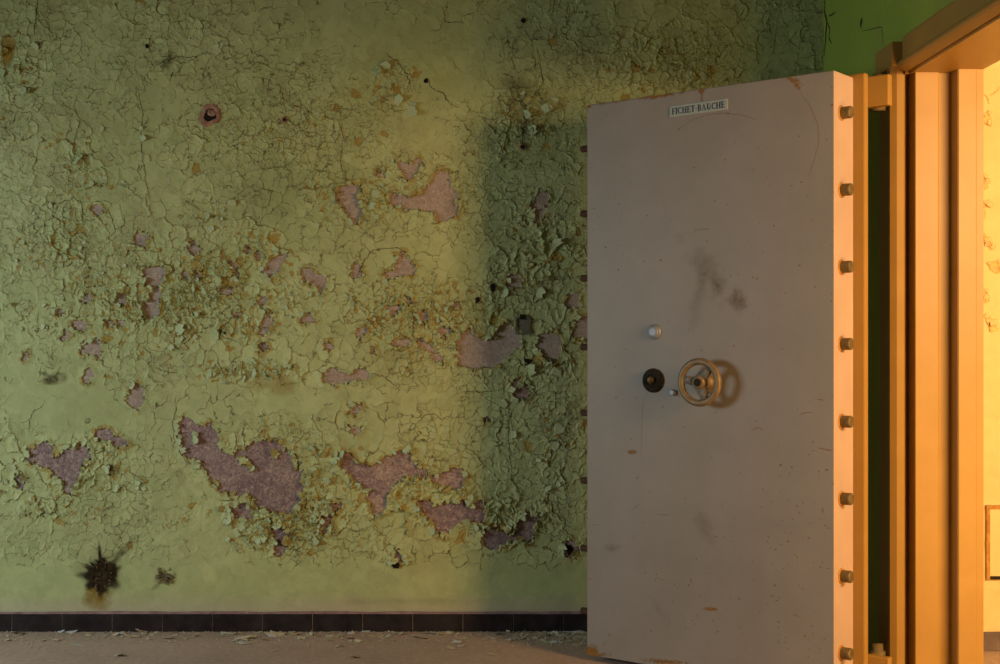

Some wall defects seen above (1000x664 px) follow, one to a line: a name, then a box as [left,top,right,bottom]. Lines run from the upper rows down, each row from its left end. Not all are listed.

crack [386,53,457,112]
crack [506,27,544,143]
crack [138,96,152,203]
peeling [335,157,464,225]
peeling [138,266,199,351]
peeling [322,367,370,388]
peeling [355,290,587,409]
peeling [0,428,128,502]
peeling [173,416,547,556]